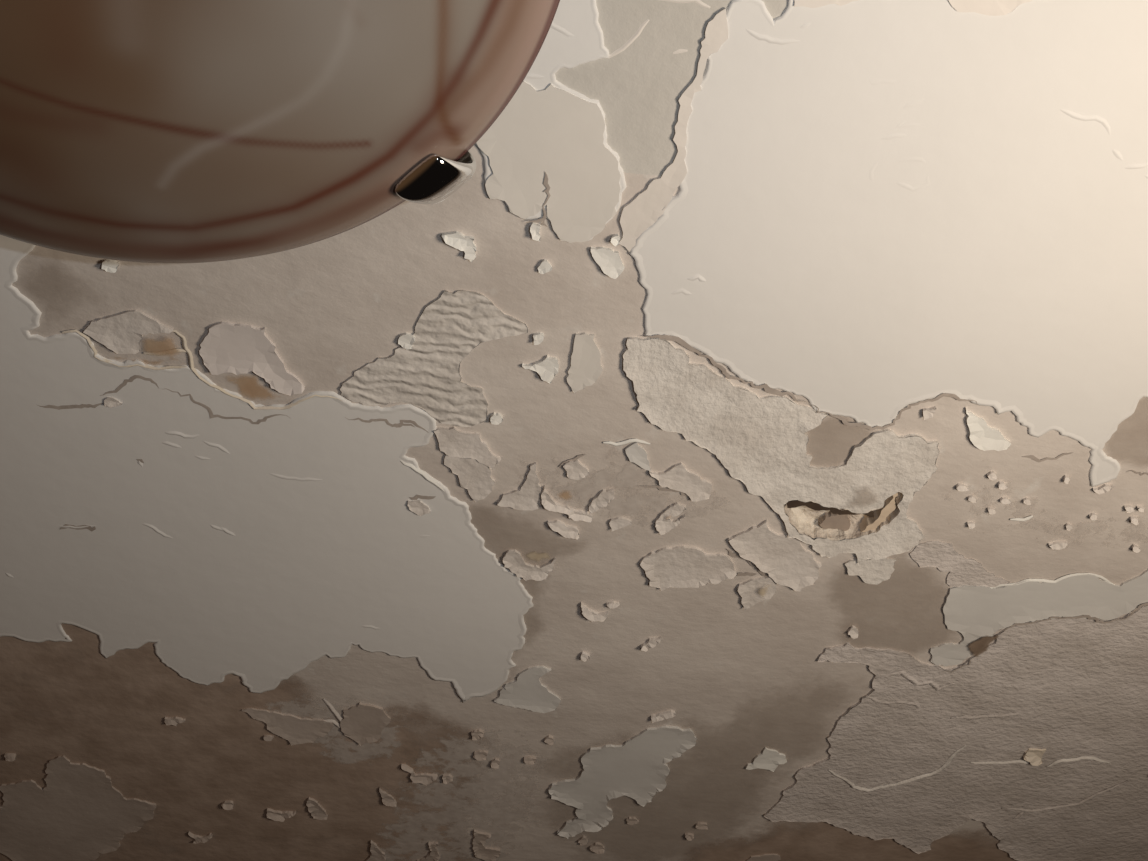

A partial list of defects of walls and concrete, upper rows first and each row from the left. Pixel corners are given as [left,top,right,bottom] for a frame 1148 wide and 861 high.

peeling [549,0,859,252]
peeling [83,310,173,354]
peeling [172,321,338,411]
crack [38,375,290,424]
peeling [768,385,1148,487]
peeling [497,462,541,511]
peeling [649,462,712,502]
spalling [783,492,904,541]
peeling [640,545,737,591]
peeling [729,520,822,592]
damp [0,623,473,861]
damp [690,821,1018,861]